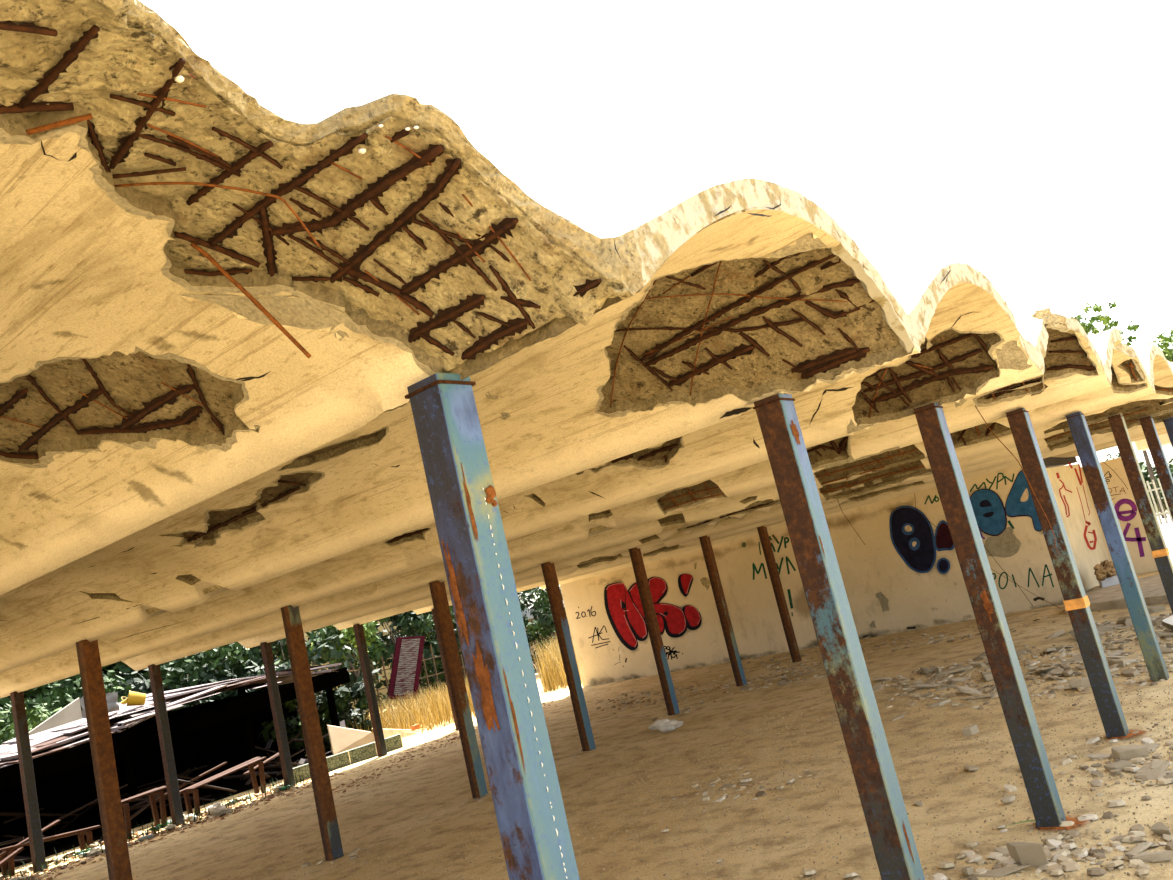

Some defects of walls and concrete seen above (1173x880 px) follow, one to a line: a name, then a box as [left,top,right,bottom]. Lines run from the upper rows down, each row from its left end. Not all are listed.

spalling [0,0,1173,501]
rust [790,420,801,445]
spalling [167,427,389,548]
rust [461,462,478,540]
rust [485,485,497,507]
spalling [641,479,780,557]
rust [980,588,993,622]
rust [442,539,526,774]